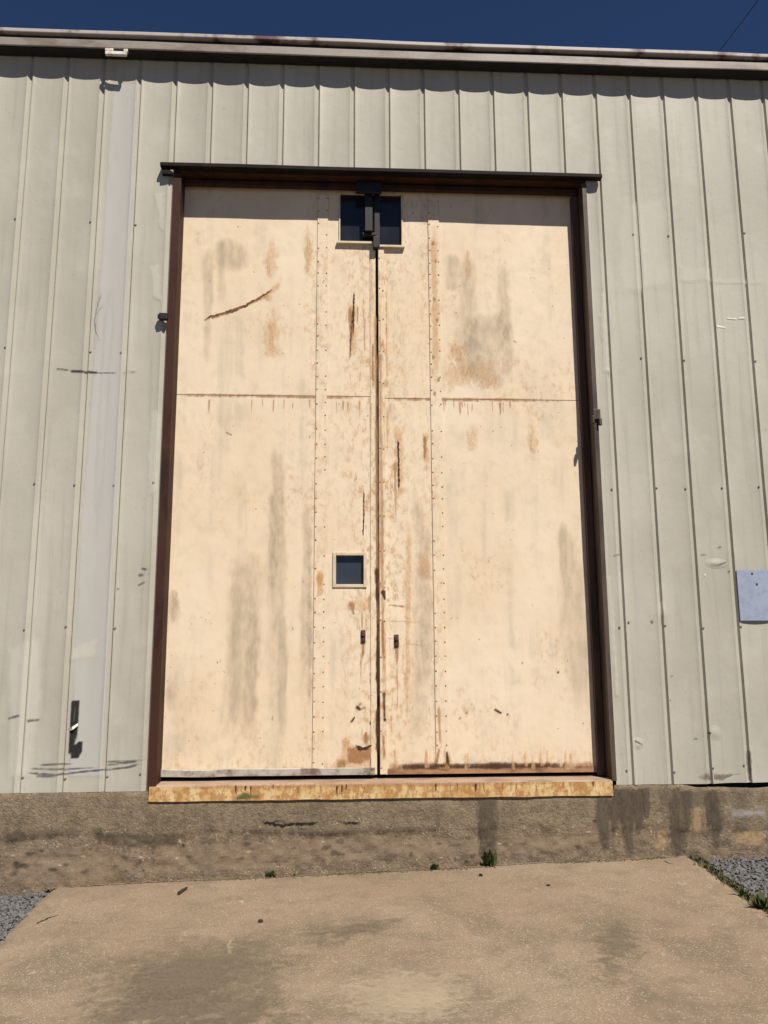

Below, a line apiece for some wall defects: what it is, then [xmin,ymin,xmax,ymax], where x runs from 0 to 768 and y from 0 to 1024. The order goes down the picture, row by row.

rust [196,394,344,409]
rust [409,378,535,414]
rust [349,308,386,625]
rust [362,621,398,757]
rust [331,750,593,792]
leakage [479,799,497,857]
leakage [597,775,765,854]